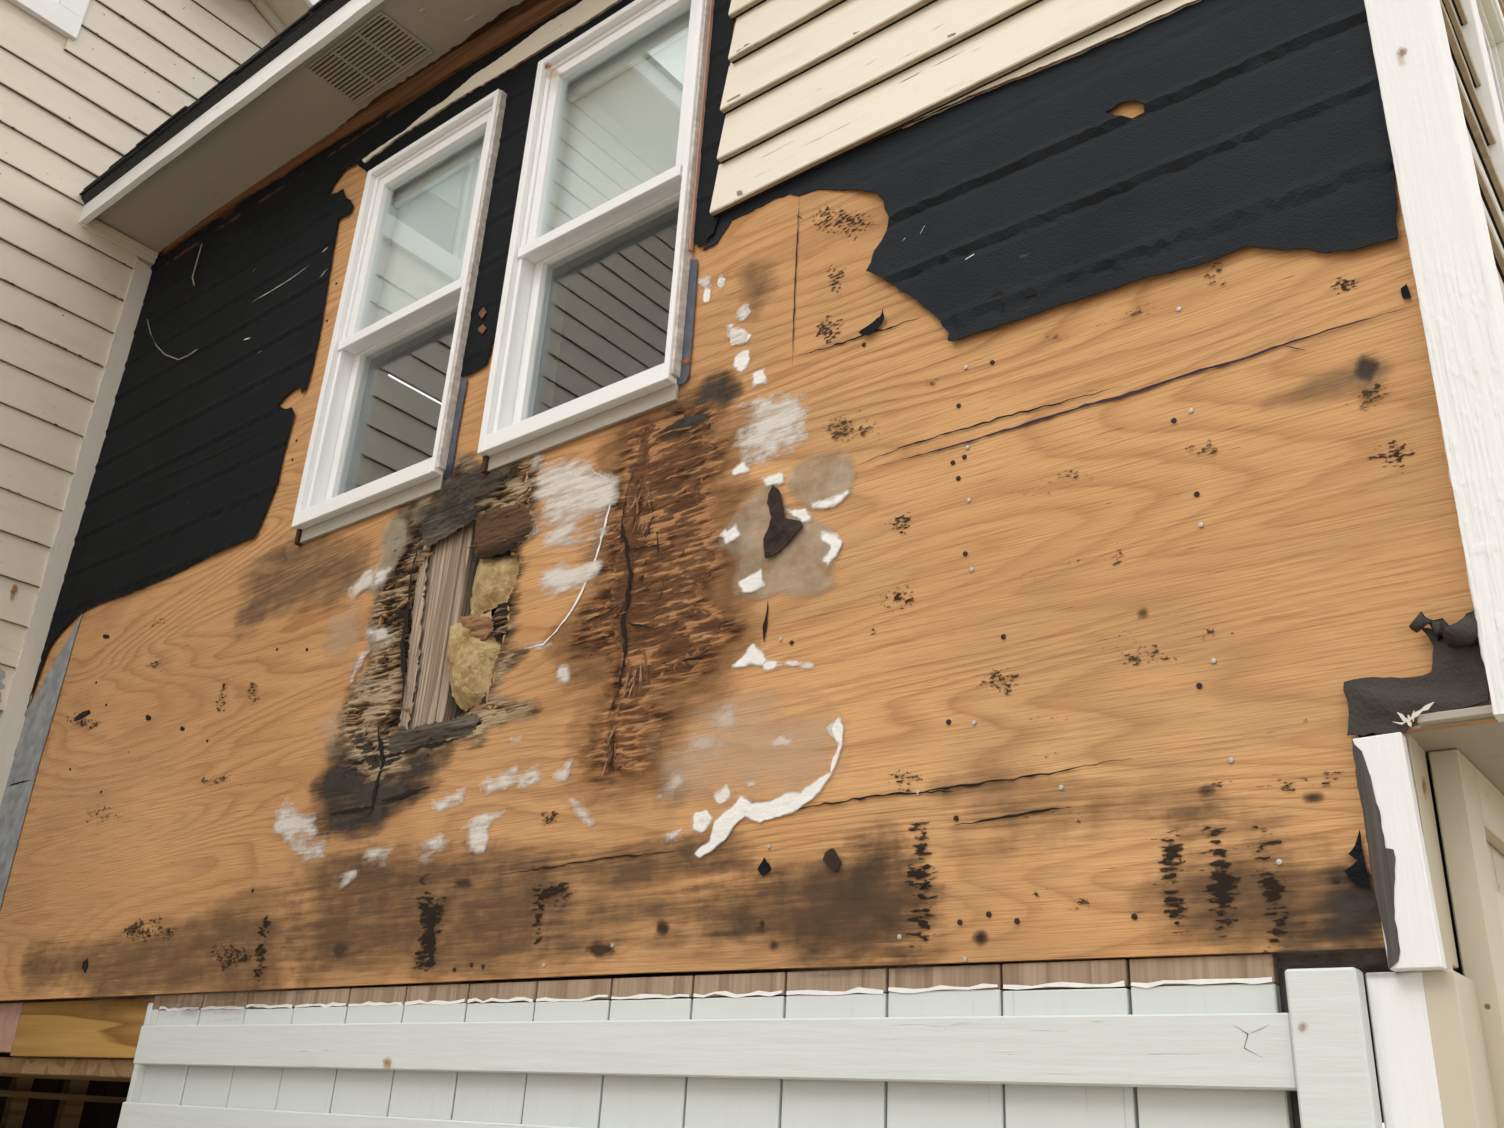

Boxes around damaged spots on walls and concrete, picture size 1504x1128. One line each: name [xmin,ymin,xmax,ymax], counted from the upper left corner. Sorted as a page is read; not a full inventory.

crack [852,304,1418,468]
water stain [404,460,512,532]
water stain [764,473,783,486]
water stain [541,285,766,791]
water stain [350,629,387,682]
crack [797,758,1131,825]
water stain [1258,771,1342,791]
water stain [293,737,735,972]
water stain [715,822,938,956]
water stain [1151,826,1388,965]
water stain [27,913,278,993]